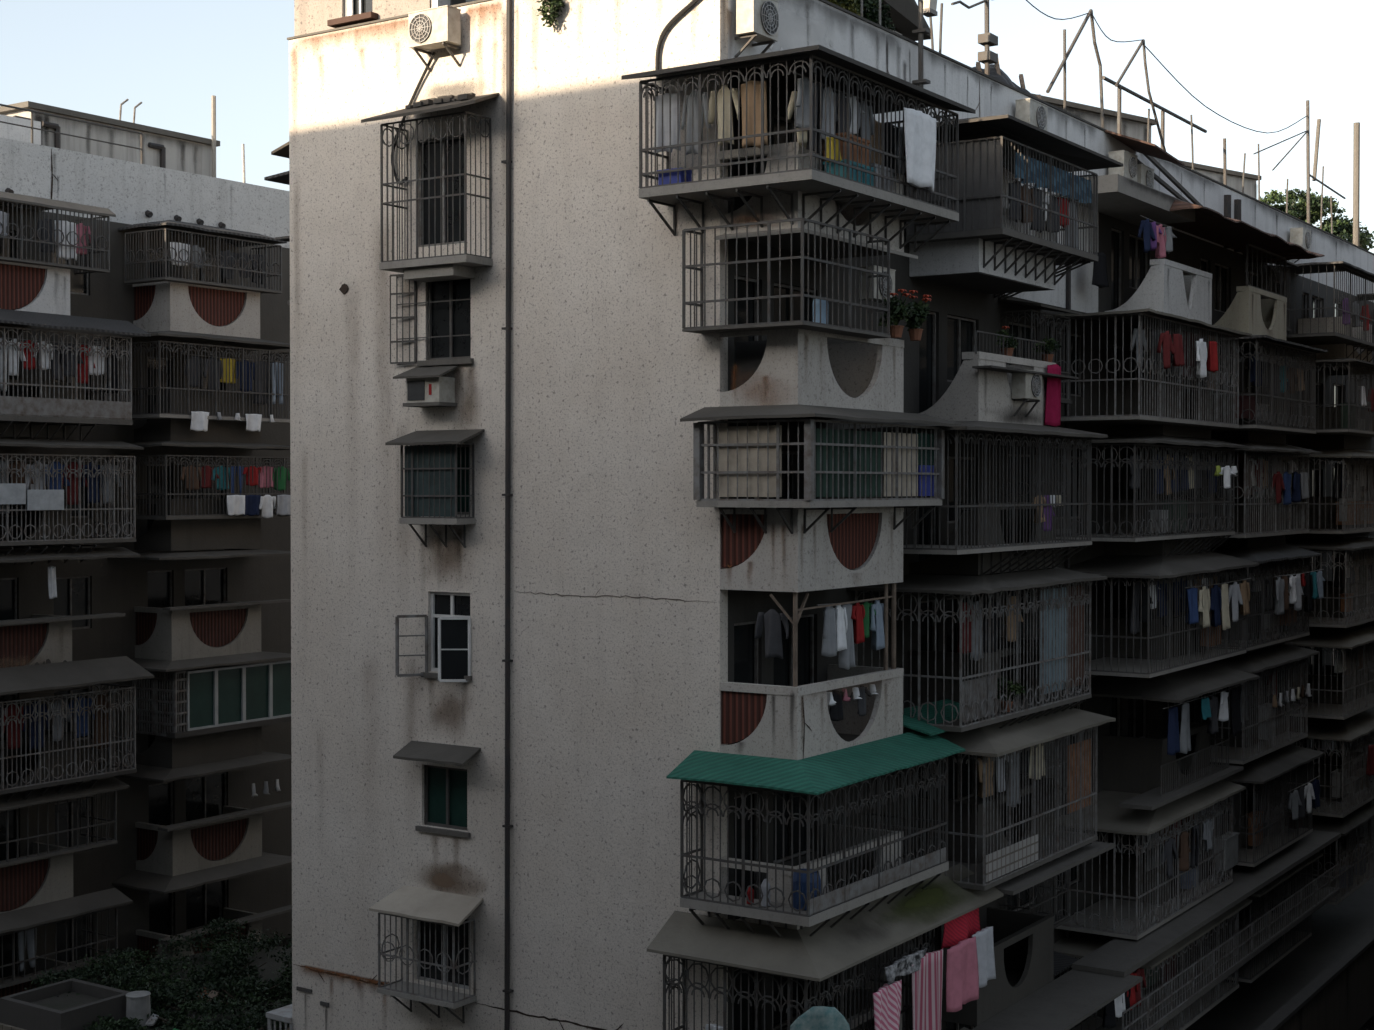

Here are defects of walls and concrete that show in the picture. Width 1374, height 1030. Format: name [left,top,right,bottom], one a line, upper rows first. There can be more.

crack [517,591,717,605]
rust [304,965,389,987]
crack [475,1002,623,1030]